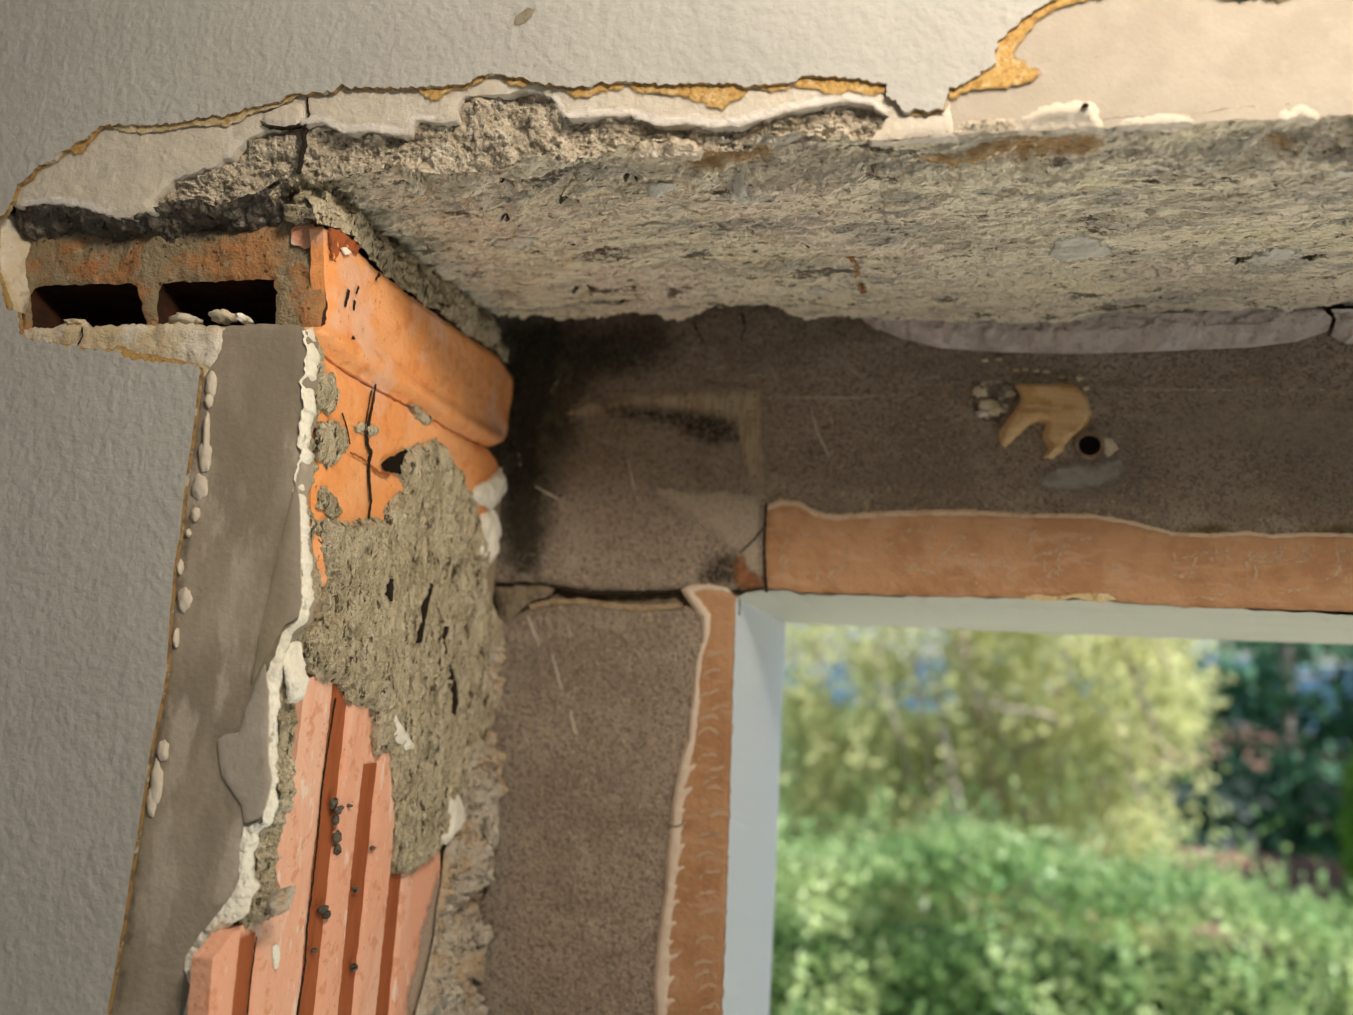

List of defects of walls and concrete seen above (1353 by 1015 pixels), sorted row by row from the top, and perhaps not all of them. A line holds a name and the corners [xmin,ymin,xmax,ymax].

crack [261,97,310,174]
peeling [0,0,1353,377]
crack [341,384,389,519]
spalling [381,449,408,475]
spalling [183,328,326,1015]